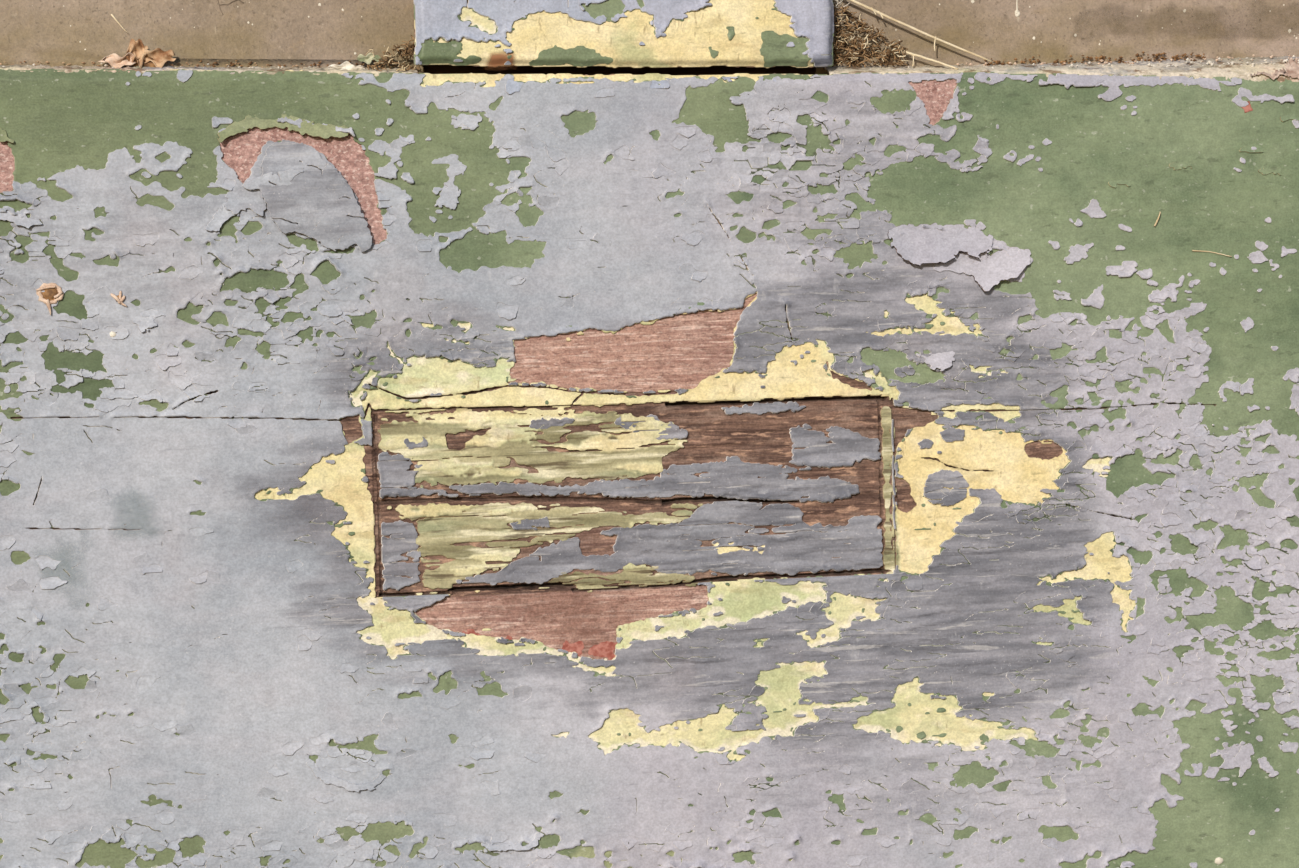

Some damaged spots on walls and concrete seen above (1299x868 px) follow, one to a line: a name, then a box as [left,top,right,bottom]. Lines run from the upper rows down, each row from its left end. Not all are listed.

peeling [549,110,597,138]
peeling [84,228,104,241]
peeling [130,187,174,211]
peeling [0,287,182,421]
crack [11,384,1216,597]
peeling [712,528,769,554]
peeling [0,536,117,810]
peeling [257,712,417,803]
peeling [19,783,692,868]
peeling [710,764,800,867]
peeling [1038,816,1105,850]
peeling [1057,851,1101,868]